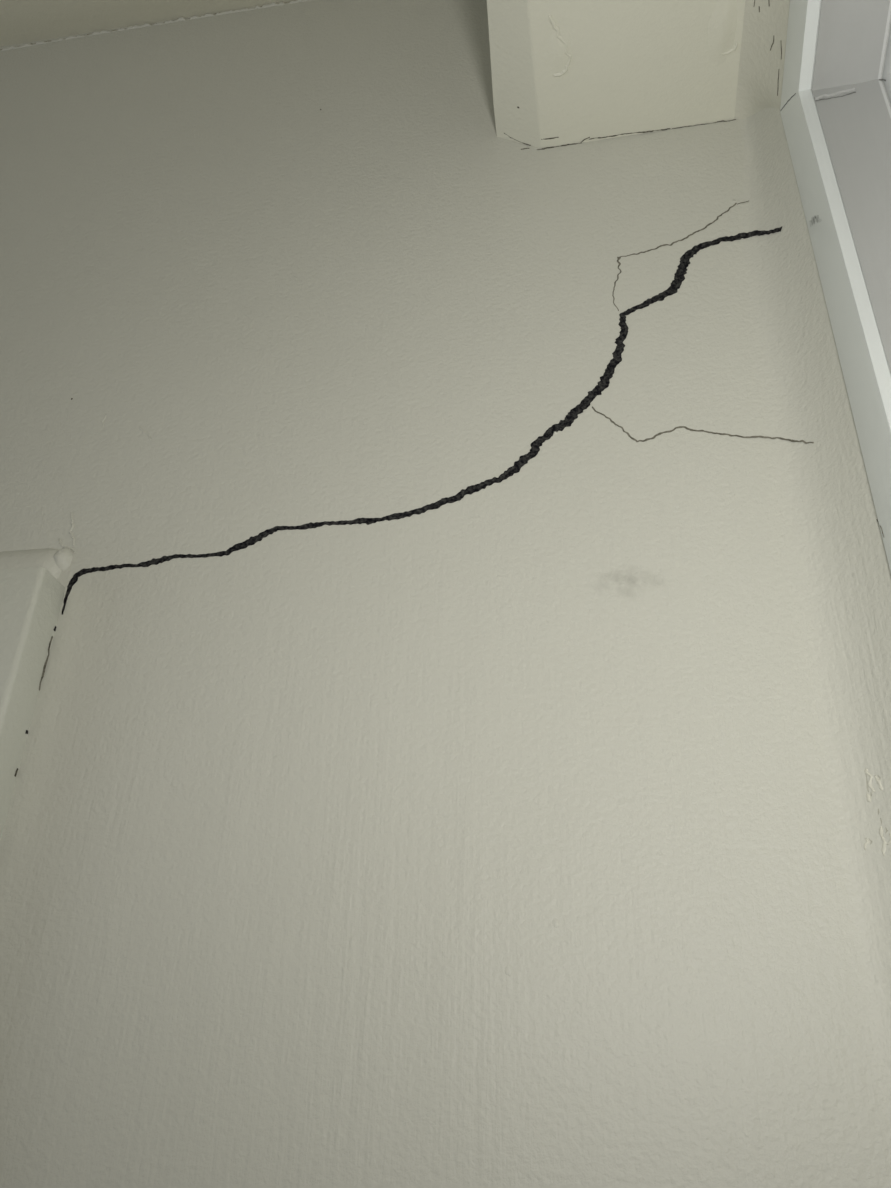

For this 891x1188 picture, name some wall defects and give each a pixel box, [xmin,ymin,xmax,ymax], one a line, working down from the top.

crack [39,199,814,691]